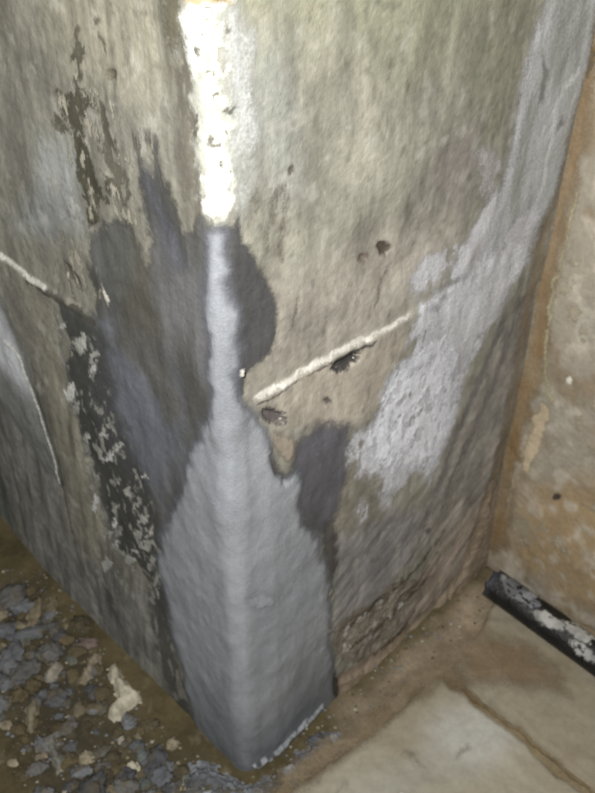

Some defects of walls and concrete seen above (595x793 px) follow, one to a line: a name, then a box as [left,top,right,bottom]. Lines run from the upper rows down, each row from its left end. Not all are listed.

spalling [54,41,138,244]
crack [0,252,95,325]
flaking render [56,316,100,382]
spalling [53,233,110,305]
damp [56,0,277,715]
crack [253,313,411,405]
damp [292,0,595,582]
flaking render [63,380,163,608]